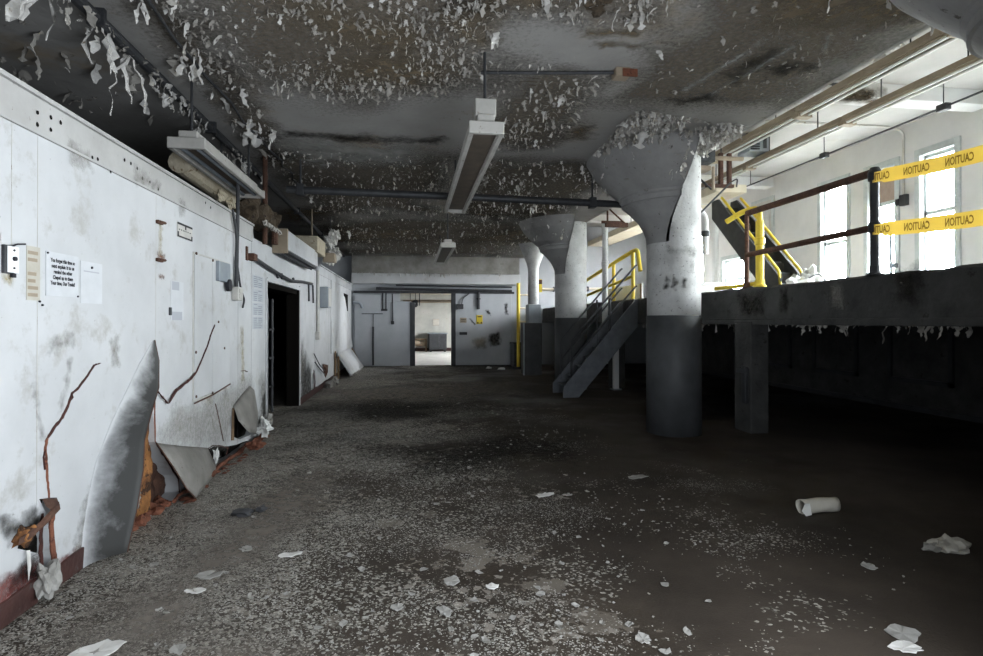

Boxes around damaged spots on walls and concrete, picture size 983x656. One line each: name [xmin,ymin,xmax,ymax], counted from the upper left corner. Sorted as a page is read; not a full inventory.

peeling [0,20,44,84]
crack [158,324,215,404]
crack [43,363,101,498]
hole [150,463,166,502]